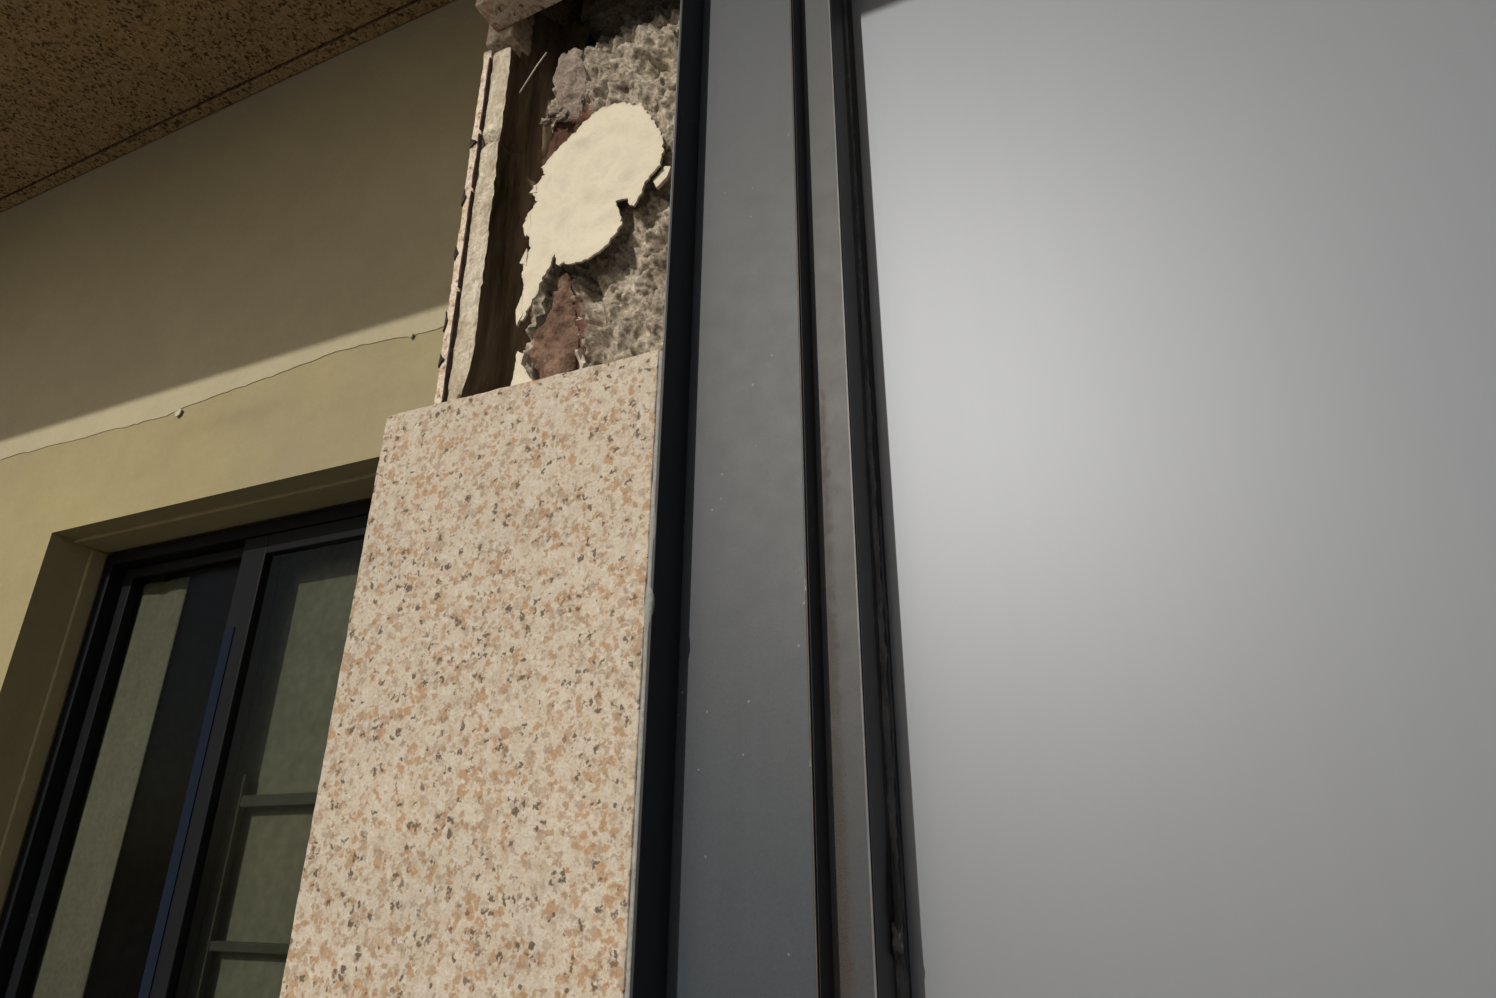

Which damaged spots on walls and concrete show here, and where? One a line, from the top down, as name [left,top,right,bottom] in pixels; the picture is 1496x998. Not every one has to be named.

spalling [503,0,680,387]